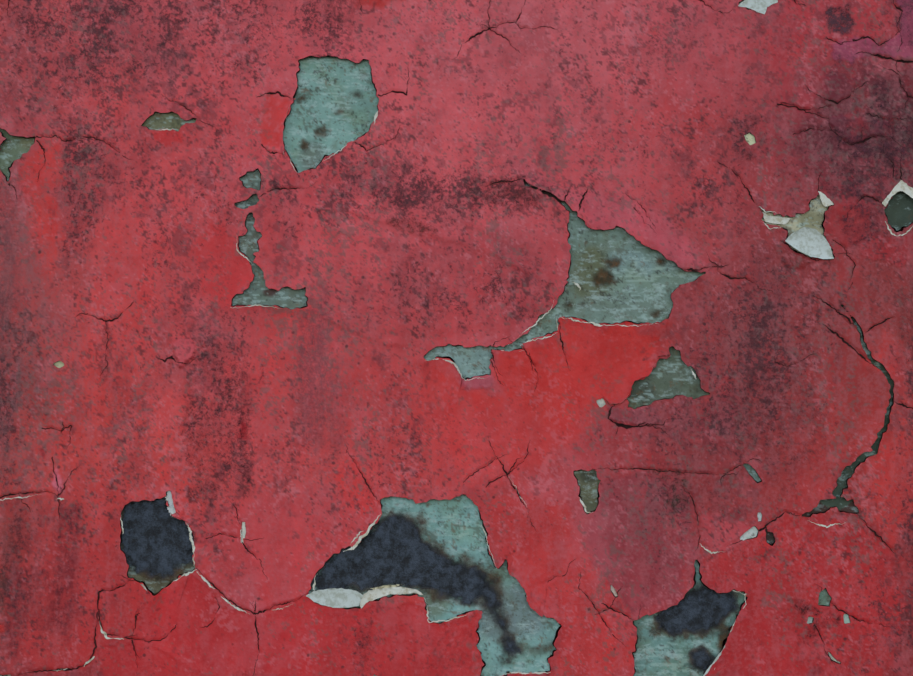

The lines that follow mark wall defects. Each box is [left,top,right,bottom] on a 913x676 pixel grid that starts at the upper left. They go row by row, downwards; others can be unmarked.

crack [777,0,913,180]
peeling [217,44,394,327]
peeling [409,200,726,425]
crack [678,254,775,297]
peeling [747,178,851,274]
crack [726,195,913,552]
peeling [868,178,913,246]
crack [0,575,176,676]
peeling [106,487,212,625]
crack [196,568,301,675]
peeling [294,481,576,676]
peeling [586,543,769,676]